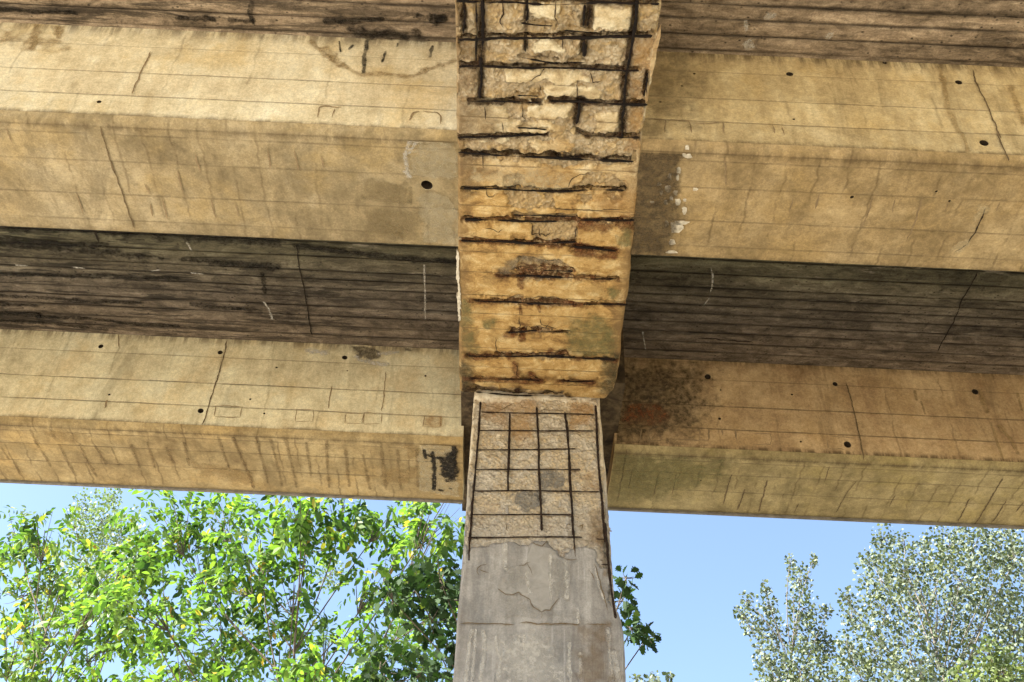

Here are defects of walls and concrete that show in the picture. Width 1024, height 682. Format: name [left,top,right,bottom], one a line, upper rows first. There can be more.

crack [132,51,151,93]
crack [100,127,201,229]
rust [457,132,631,161]
rust [458,0,658,140]
spalling [457,0,661,283]
leakage [630,152,682,255]
crack [973,70,1010,162]
crack [202,341,242,424]
spalling [496,349,569,361]
spalling [508,294,572,308]
rust [459,213,706,444]
spalling [419,384,617,612]